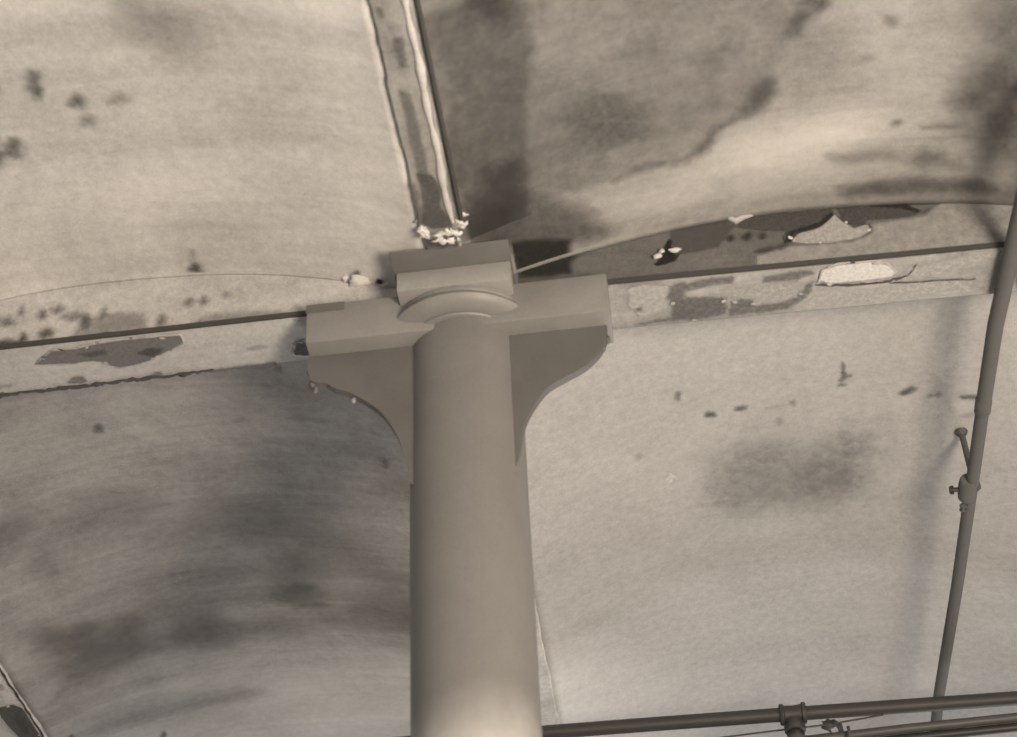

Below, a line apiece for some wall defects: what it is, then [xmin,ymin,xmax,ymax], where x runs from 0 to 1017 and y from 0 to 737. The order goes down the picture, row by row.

peeling [414,173,469,245]
peeling [643,203,1013,324]
peeling [35,334,184,369]
peeling [0,704,42,737]